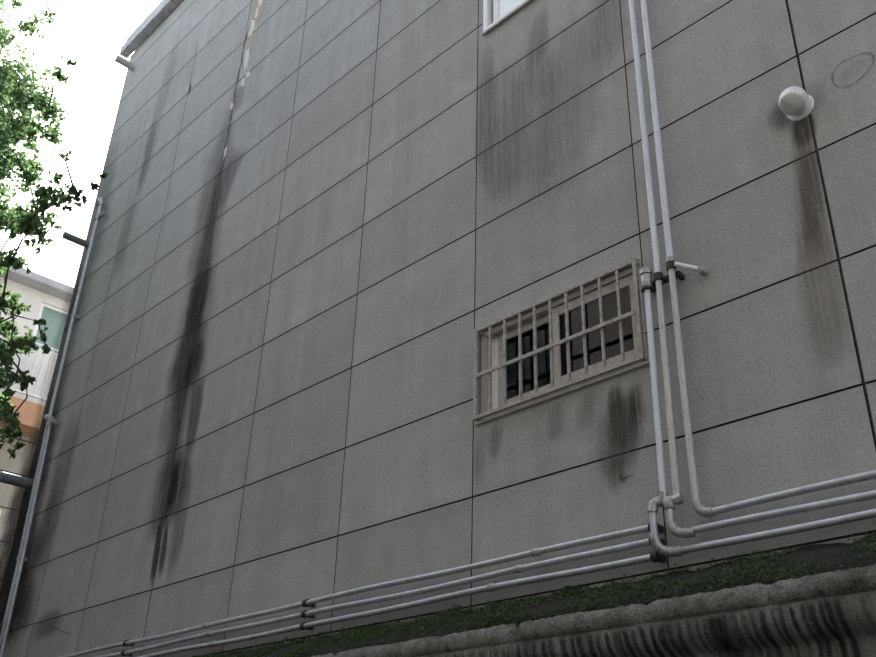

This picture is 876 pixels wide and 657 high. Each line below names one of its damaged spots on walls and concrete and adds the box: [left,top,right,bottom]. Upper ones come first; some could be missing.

peeling [248,0,263,37]
peeling [241,49,250,88]
damp [151,465,185,577]
damp [560,602,860,657]